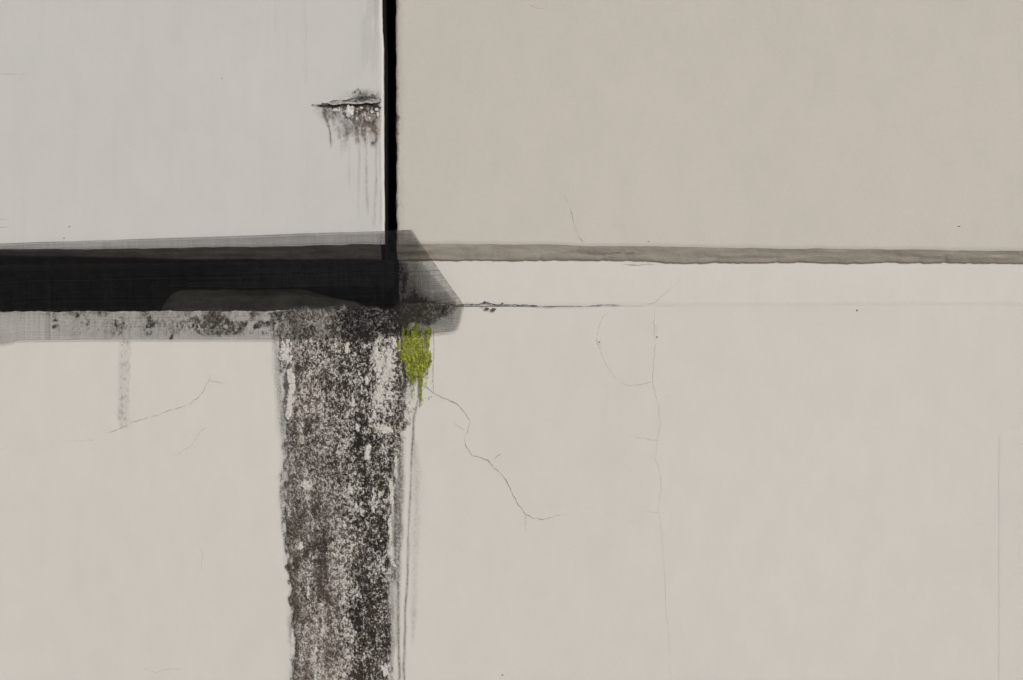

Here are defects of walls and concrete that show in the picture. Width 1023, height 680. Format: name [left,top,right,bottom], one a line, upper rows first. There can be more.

spalling [312,89,382,145]
damp [279,304,417,680]
crack [426,386,558,519]